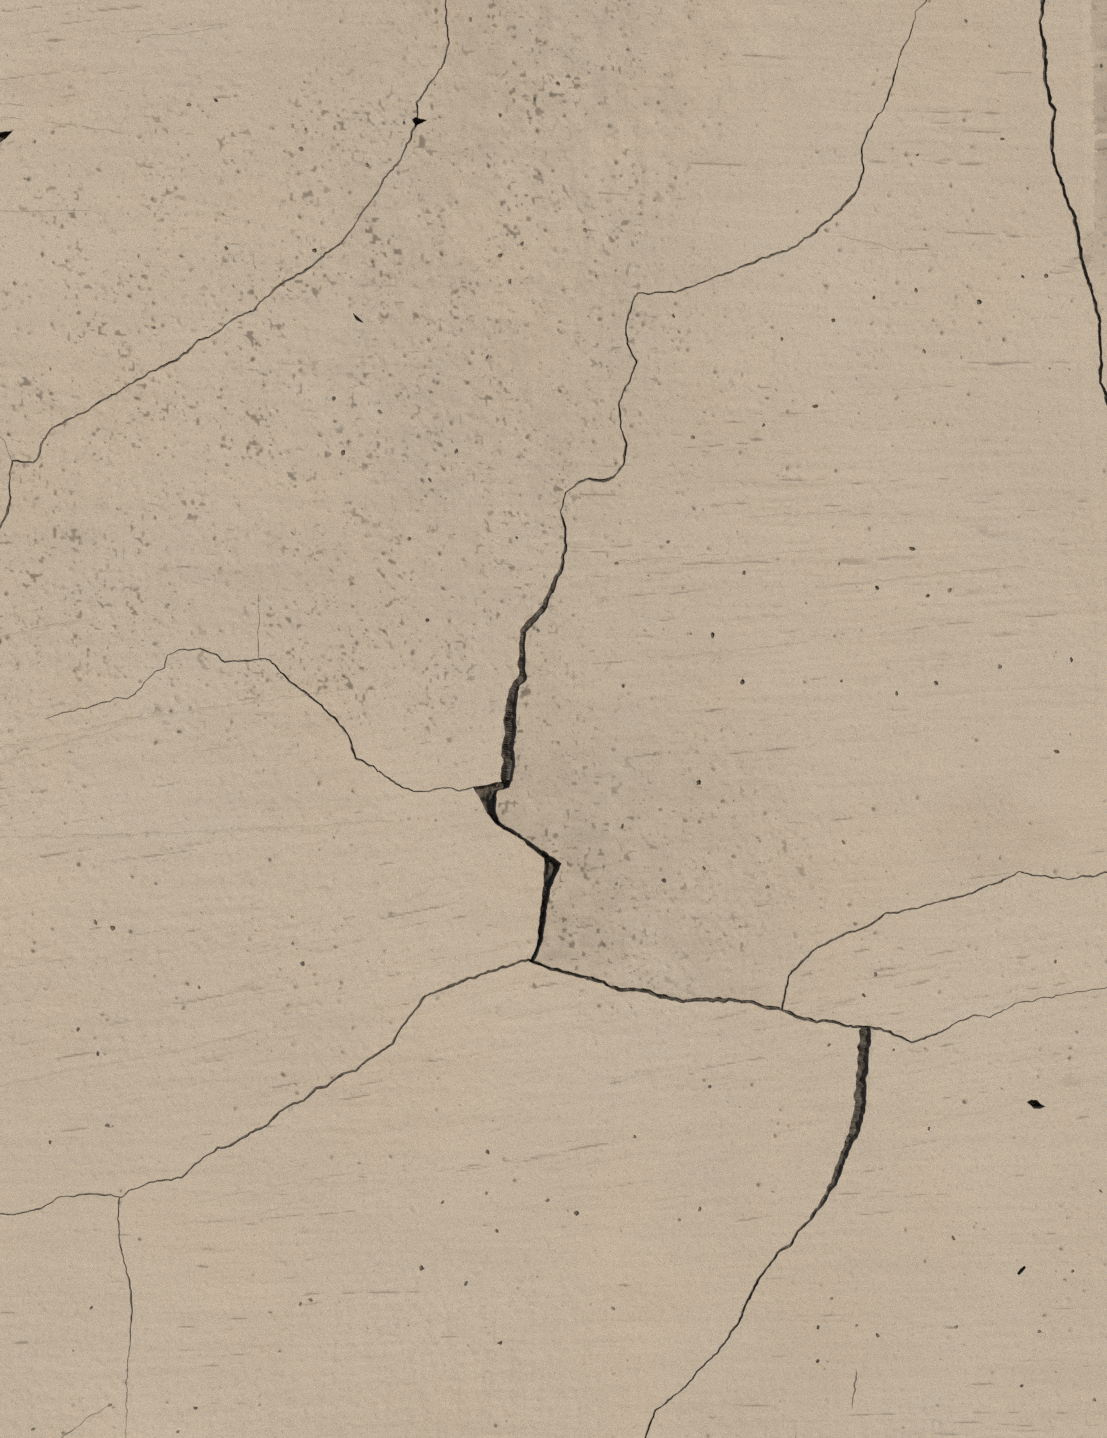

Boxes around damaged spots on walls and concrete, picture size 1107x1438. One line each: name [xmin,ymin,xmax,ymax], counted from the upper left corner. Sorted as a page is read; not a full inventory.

crack [0,0,927,962]
crack [1038,0,1107,405]
crack [0,959,530,1421]
crack [531,871,1107,1438]